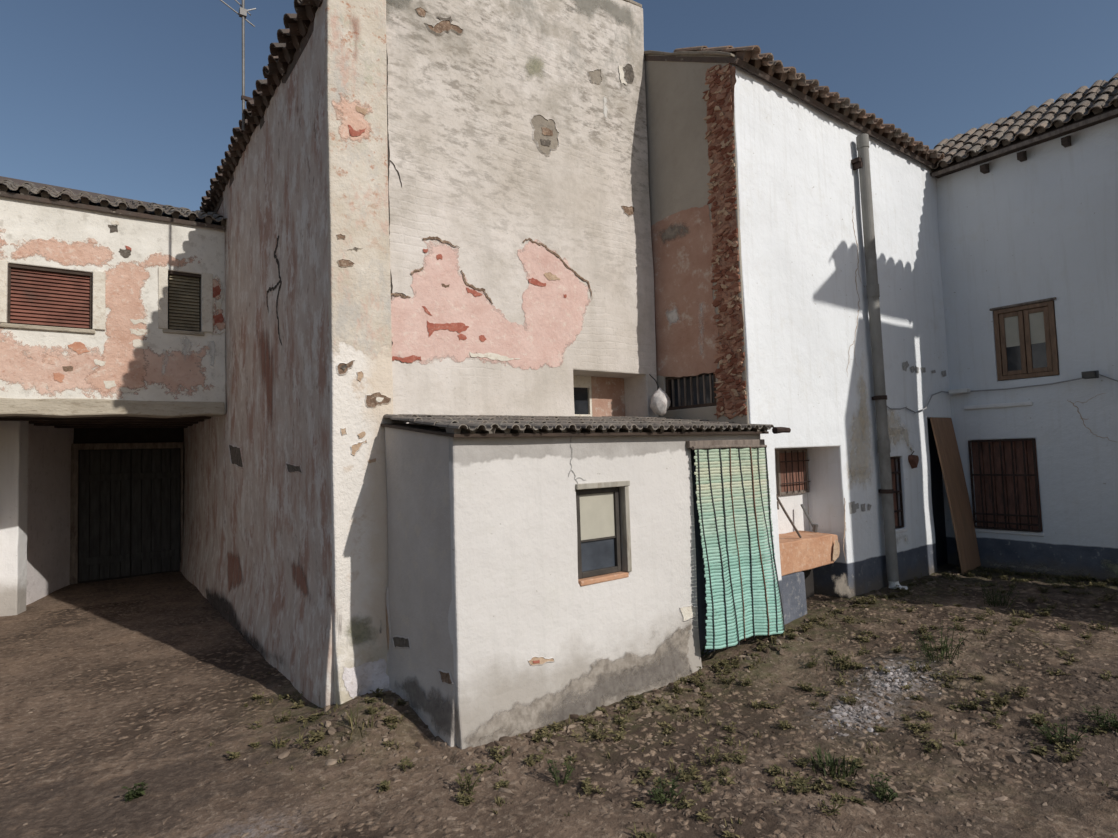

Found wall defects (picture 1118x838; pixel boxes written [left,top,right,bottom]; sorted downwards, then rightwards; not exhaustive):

flaking render [415,7,464,36]
flaking render [332,92,373,142]
flaking render [530,113,559,157]
flaking render [0,229,226,399]
flaking render [391,236,592,370]
crack [847,212,862,368]
crack [568,436,582,483]
water stain [348,619,381,644]
flaking render [528,656,554,666]
water stain [402,625,692,747]